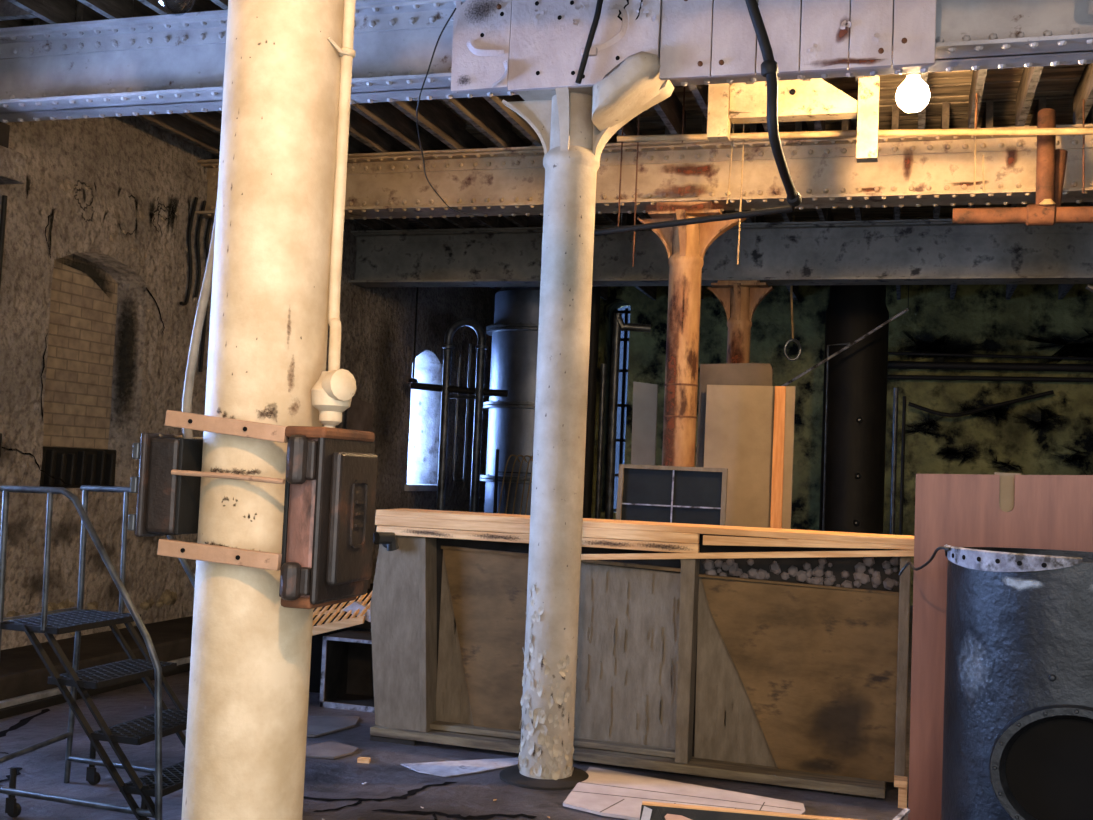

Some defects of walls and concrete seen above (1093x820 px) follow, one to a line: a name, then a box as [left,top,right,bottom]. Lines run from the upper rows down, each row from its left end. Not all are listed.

rust [837,20,849,41]
rust [904,153,912,177]
rust [1006,149,1016,167]
rust [654,165,714,212]
rust [731,337,743,363]
rust [663,292,685,466]
peeling [518,584,578,780]
crack [303,782,537,820]